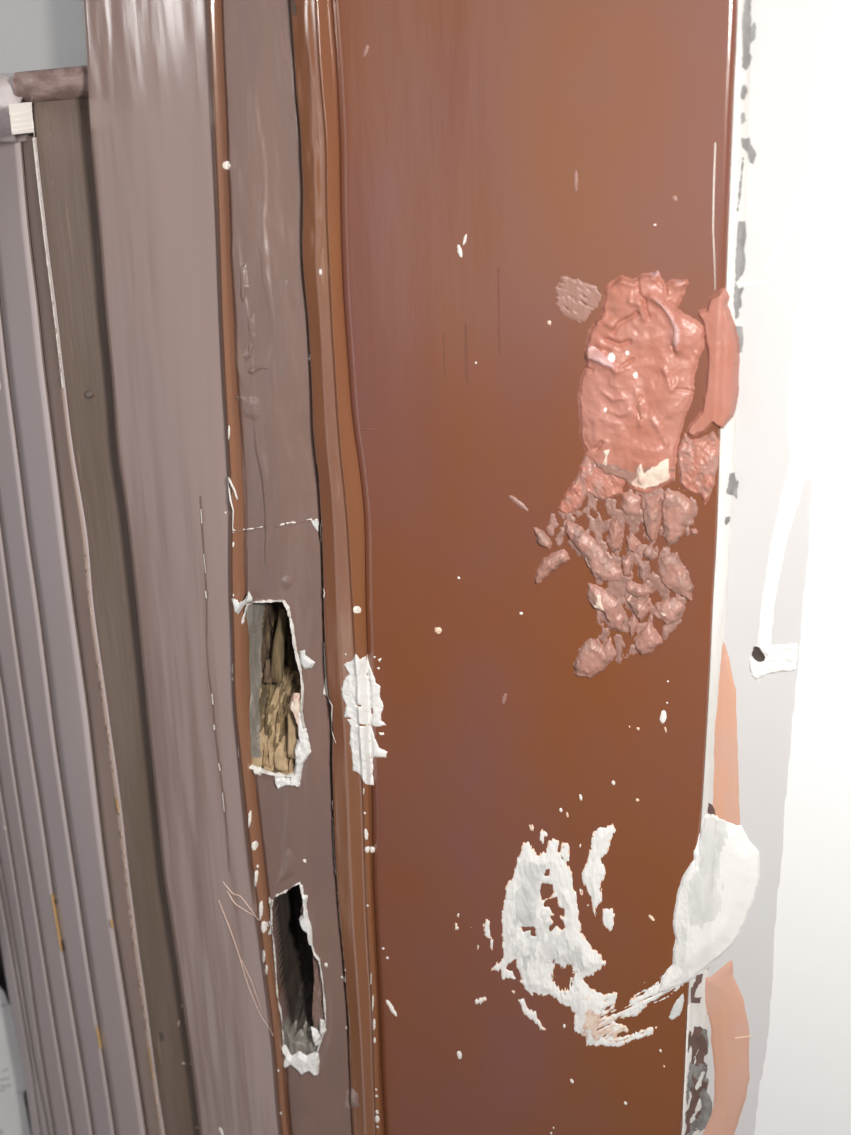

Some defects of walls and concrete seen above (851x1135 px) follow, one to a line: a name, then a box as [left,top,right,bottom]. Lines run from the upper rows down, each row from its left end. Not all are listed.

peeling [726,472,739,499]
peeling [232,592,252,614]
peeling [300,650,315,669]
peeling [341,653,387,785]
peeling [708,642,740,825]
peeling [580,823,616,932]
peeling [512,990,546,1030]
peeling [311,1019,327,1046]
peeling [669,960,752,1135]